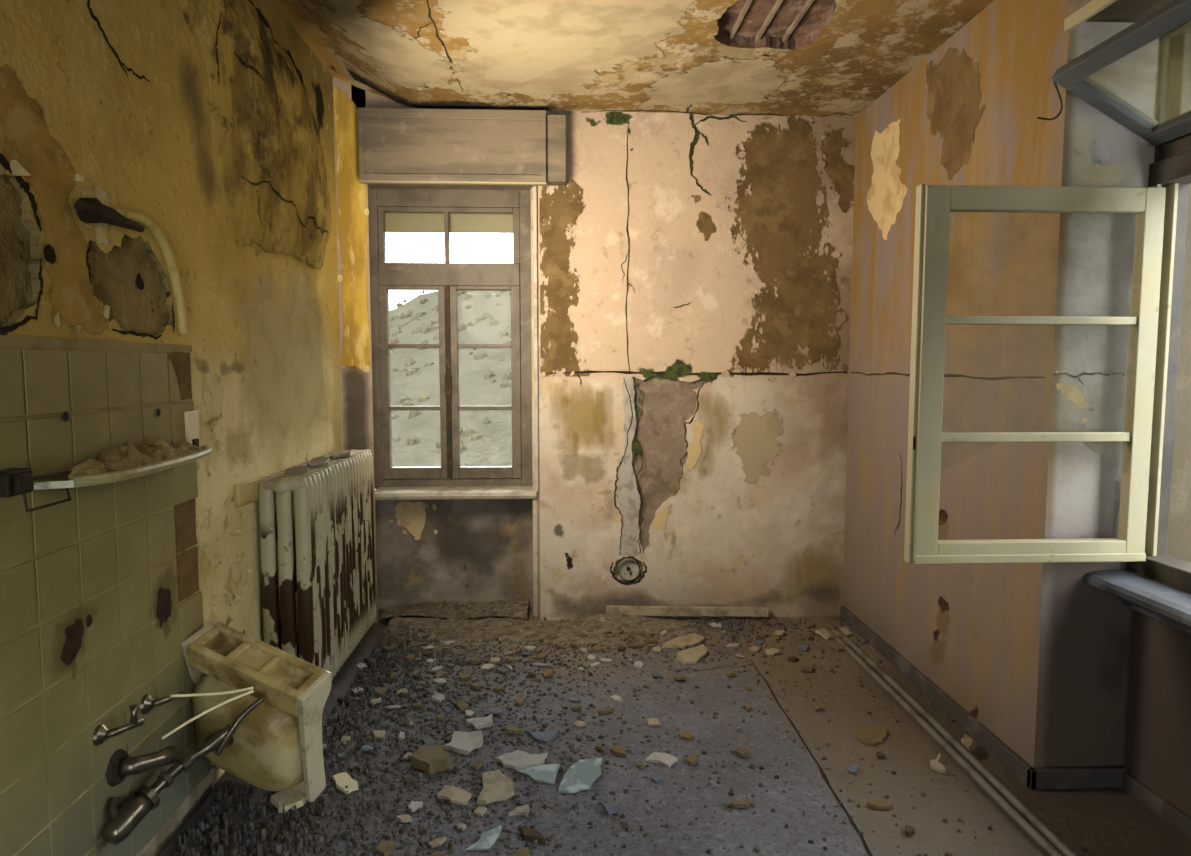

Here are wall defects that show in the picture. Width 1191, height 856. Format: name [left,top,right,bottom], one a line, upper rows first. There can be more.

crack [87,0,150,82]
peeling [314,0,698,98]
peeling [926,48,984,180]
peeling [0,64,175,340]
peeling [639,0,908,380]
peeling [167,352,192,400]
peeling [532,180,590,378]
crack [546,105,910,555]
spalling [632,374,708,553]
peeling [729,409,784,483]
corrosion [60,614,93,665]
corrosion [156,587,172,628]